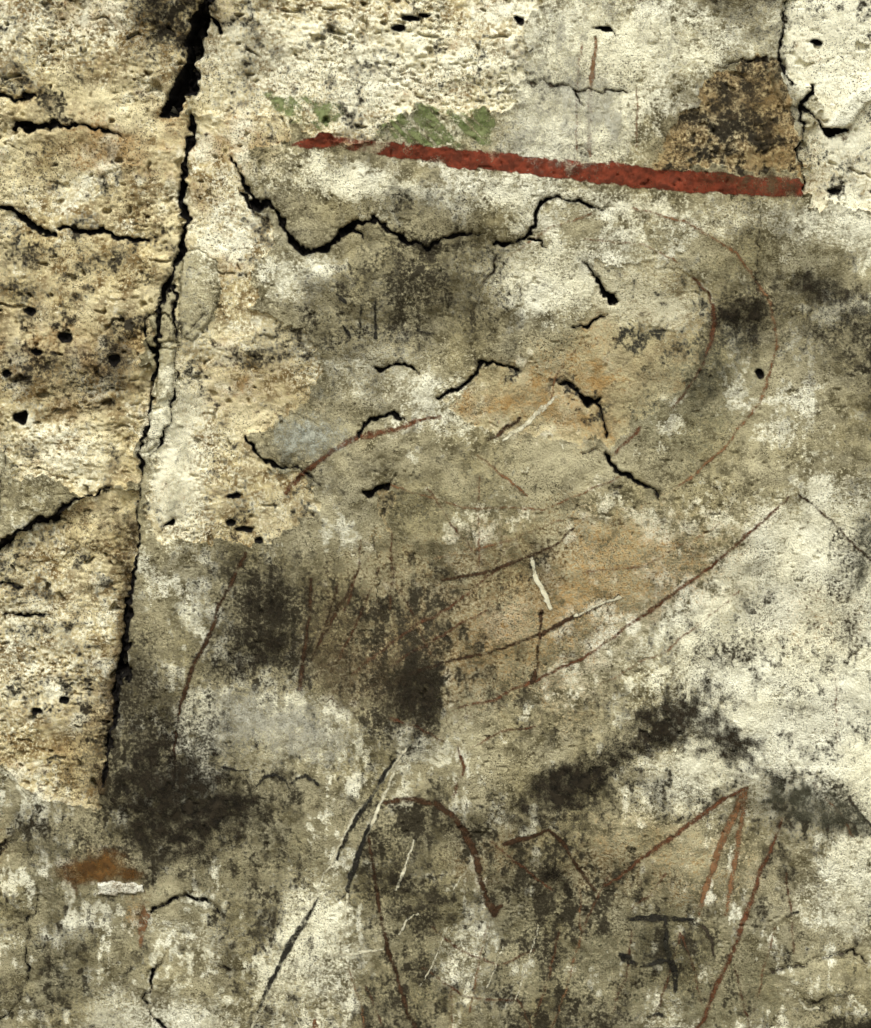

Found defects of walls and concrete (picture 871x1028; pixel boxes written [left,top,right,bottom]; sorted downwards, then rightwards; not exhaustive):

spalling [654,0,871,213]
crack [725,0,849,190]
crack [0,0,223,787]
spalling [0,0,543,812]
crack [230,158,604,319]
crack [436,344,519,400]
spalling [443,258,711,450]
crack [560,381,659,499]
damp [687,297,764,400]
mould [787,270,871,337]
efflorescence [207,684,348,770]
damp [762,778,871,837]